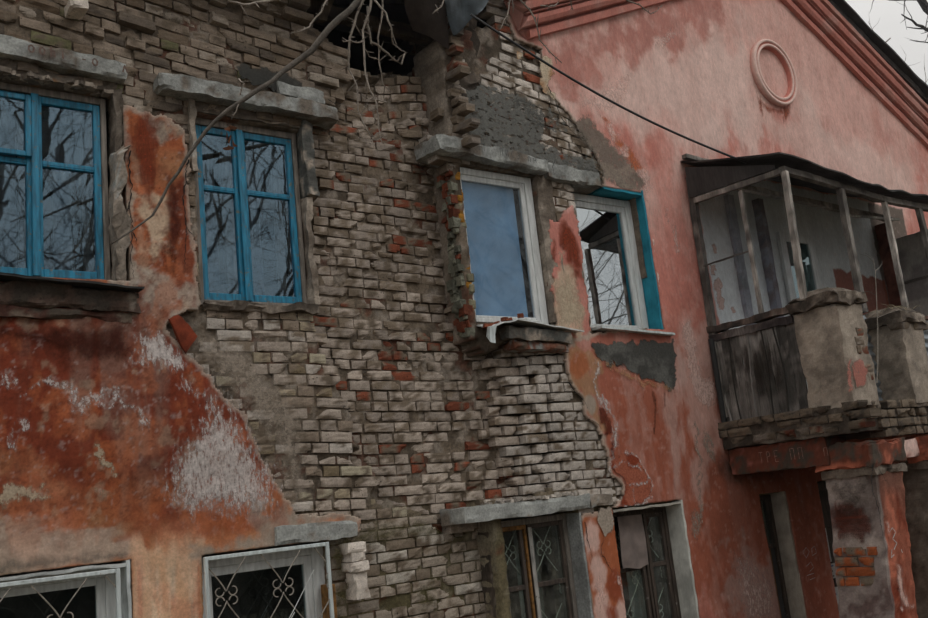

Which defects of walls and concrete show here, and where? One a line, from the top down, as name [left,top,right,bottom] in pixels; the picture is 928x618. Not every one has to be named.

damp [0,328,131,358]
damp [140,334,184,368]
spalling [0,0,652,618]
damp [45,379,147,424]
damp [166,395,269,514]
spalling [833,501,878,586]